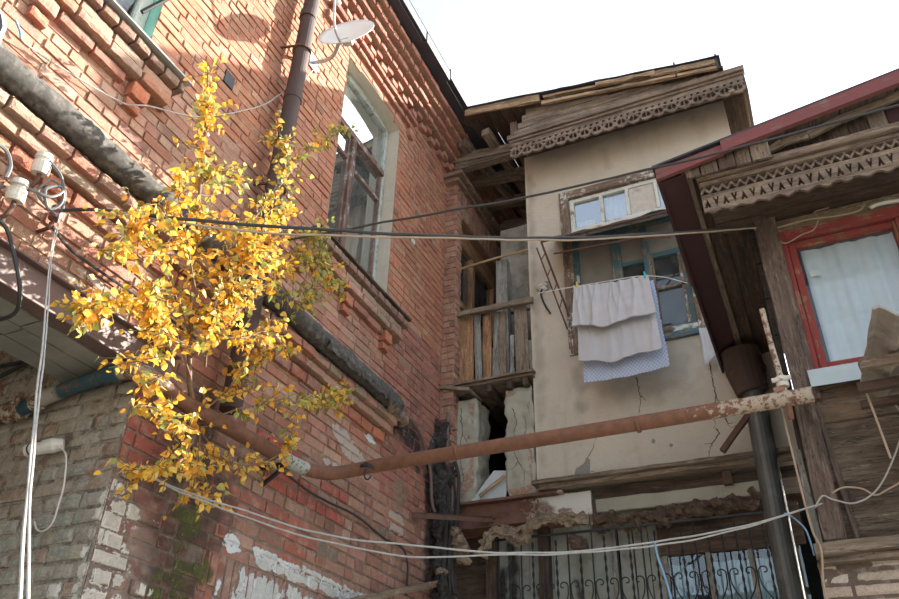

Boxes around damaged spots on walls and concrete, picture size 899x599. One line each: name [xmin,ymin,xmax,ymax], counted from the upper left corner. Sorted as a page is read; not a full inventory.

crack [708,362,735,457]
leakage [146,474,228,599]
peeling [222,533,367,599]
spalling [593,486,763,533]